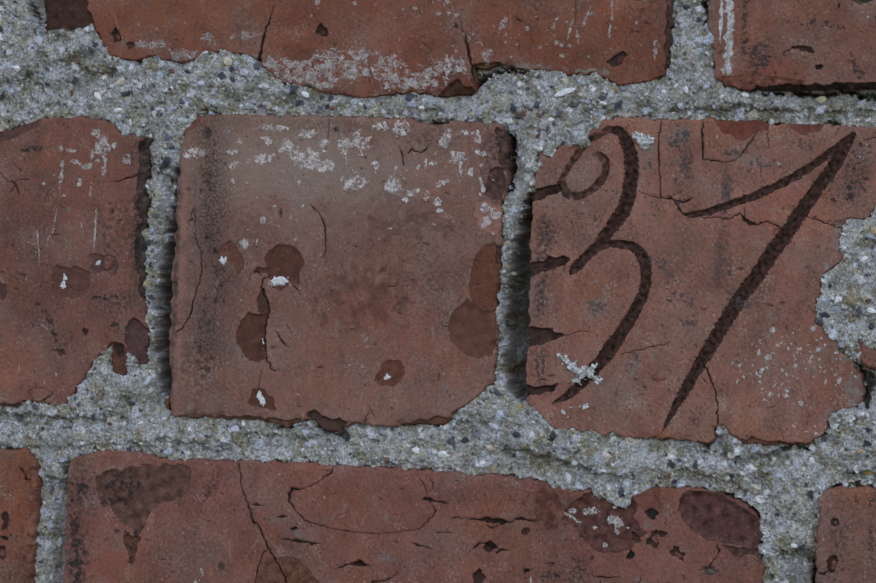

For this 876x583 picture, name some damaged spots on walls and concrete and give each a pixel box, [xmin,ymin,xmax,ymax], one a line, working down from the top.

spalling [42,0,101,38]
leakage [253,0,492,96]
leakage [226,120,501,228]
crack [637,121,784,239]
spalling [448,126,517,359]
spalling [108,318,150,376]
spalling [218,240,305,363]
spalling [95,462,191,565]
crack [238,462,287,583]
spalling [257,556,319,583]
crack [288,468,436,534]
spalling [678,490,762,559]